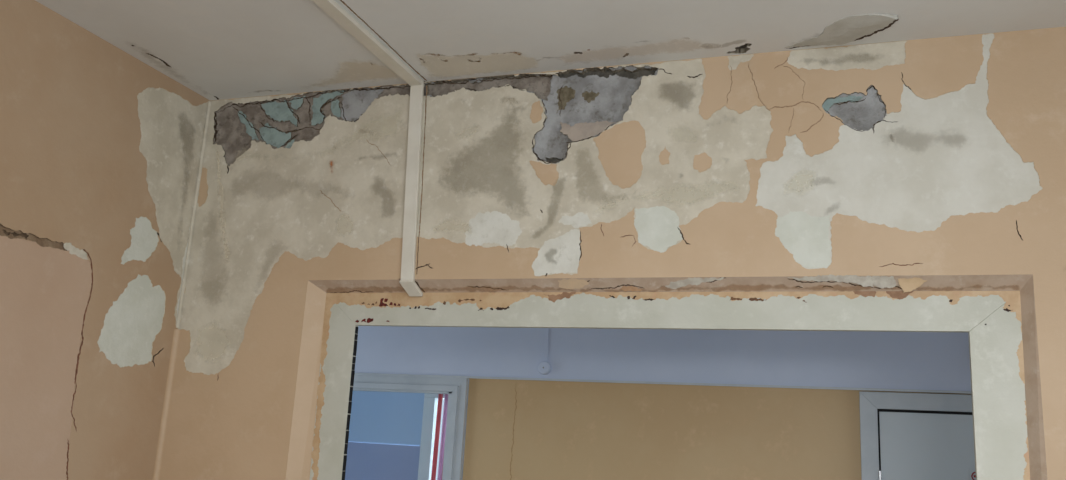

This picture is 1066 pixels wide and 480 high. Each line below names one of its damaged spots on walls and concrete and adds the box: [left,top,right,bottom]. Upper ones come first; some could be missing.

crack [0,224,93,480]
peeling [97,84,411,375]
spalling [362,298,509,311]
peeling [609,286,654,301]
peeling [417,33,1043,292]
crack [727,46,824,133]